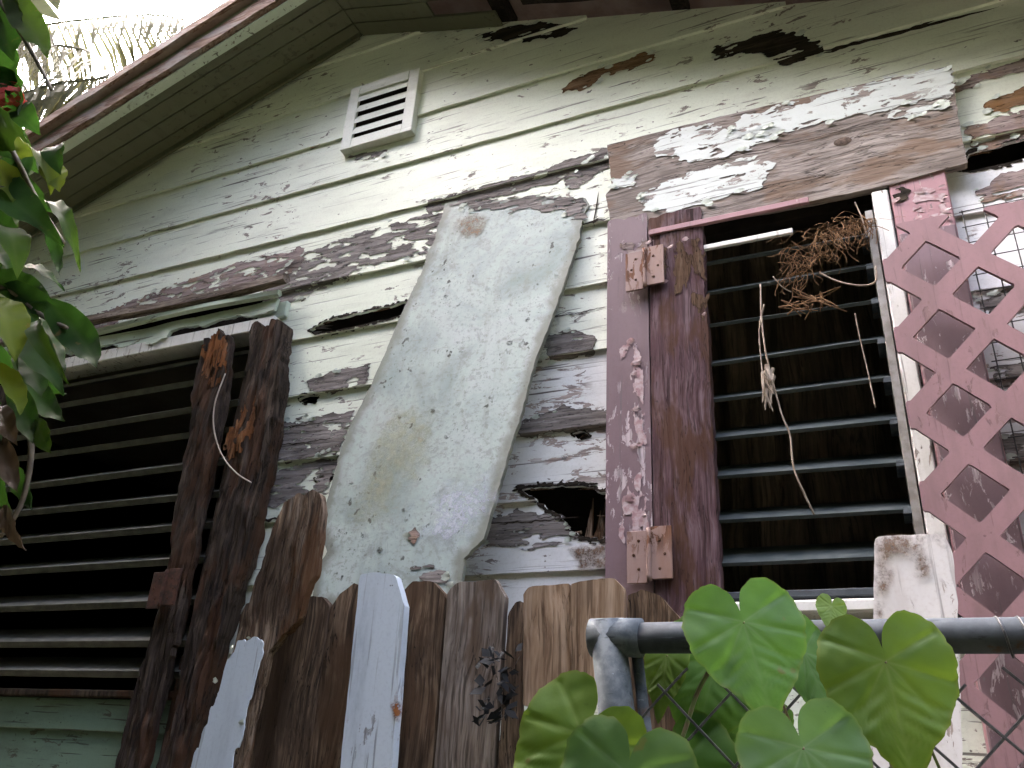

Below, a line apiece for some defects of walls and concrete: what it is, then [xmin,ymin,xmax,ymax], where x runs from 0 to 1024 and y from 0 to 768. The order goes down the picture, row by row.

peeling [561,49,656,93]
peeling [91,58,1024,329]
spalling [307,299,408,339]
peeling [539,327,597,365]
peeling [268,363,370,511]
peeling [518,404,606,440]
peeling [619,338,647,449]
peeling [483,479,606,551]
peeling [619,472,649,543]